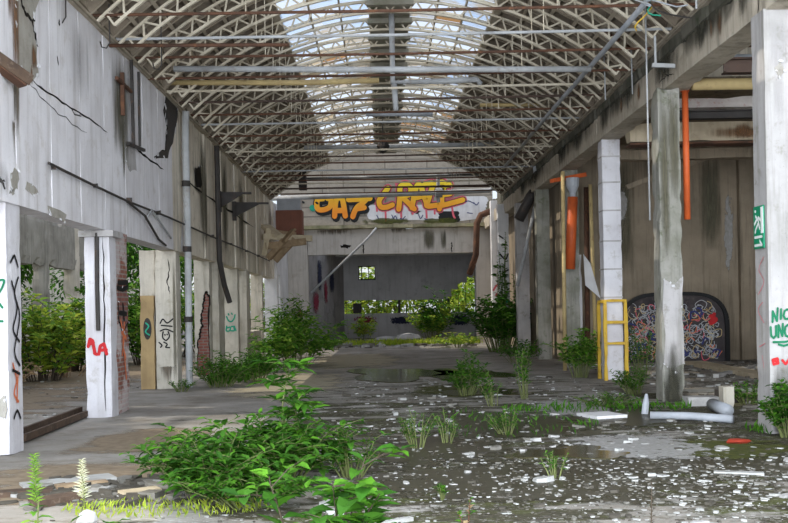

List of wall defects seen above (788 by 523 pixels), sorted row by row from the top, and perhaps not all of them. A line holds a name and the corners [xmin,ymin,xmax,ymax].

spalling [15,0,43,84]
leakage [656,49,674,78]
leakage [683,0,745,49]
spalling [154,97,178,160]
spalling [9,168,39,197]
spalling [117,287,130,333]
spalling [197,291,211,375]
leakage [338,354,788,507]